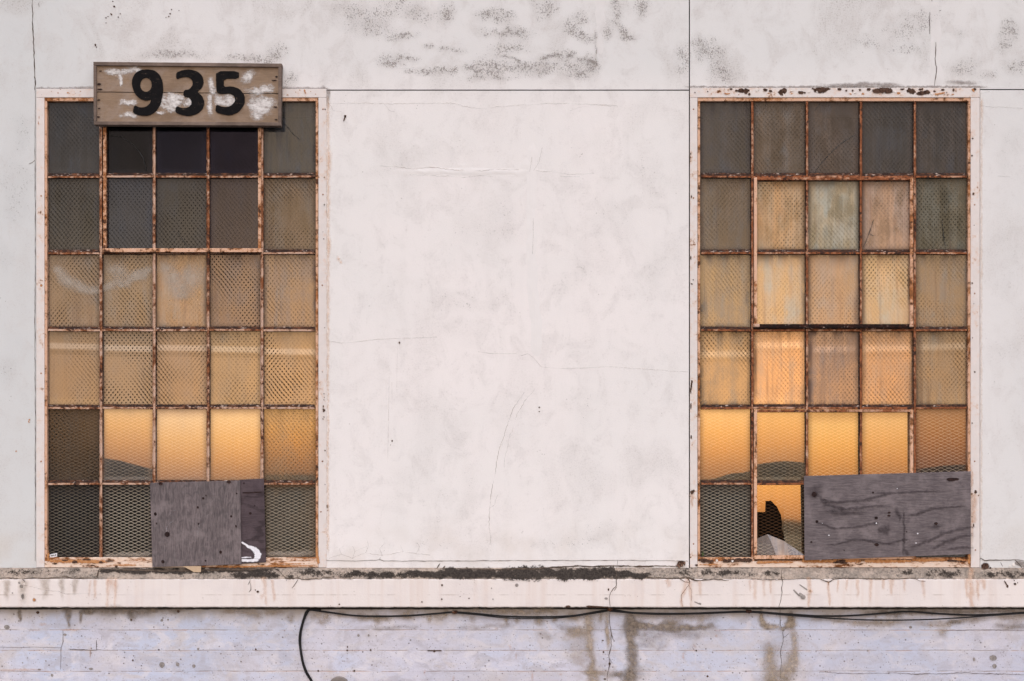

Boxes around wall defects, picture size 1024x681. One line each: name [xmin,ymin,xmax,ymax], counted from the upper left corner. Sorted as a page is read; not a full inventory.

water stain [99,565,651,582]
water stain [571,616,610,681]
crack [476,560,723,681]
water stain [614,614,714,681]
water stain [760,613,797,681]
crack [757,572,919,679]